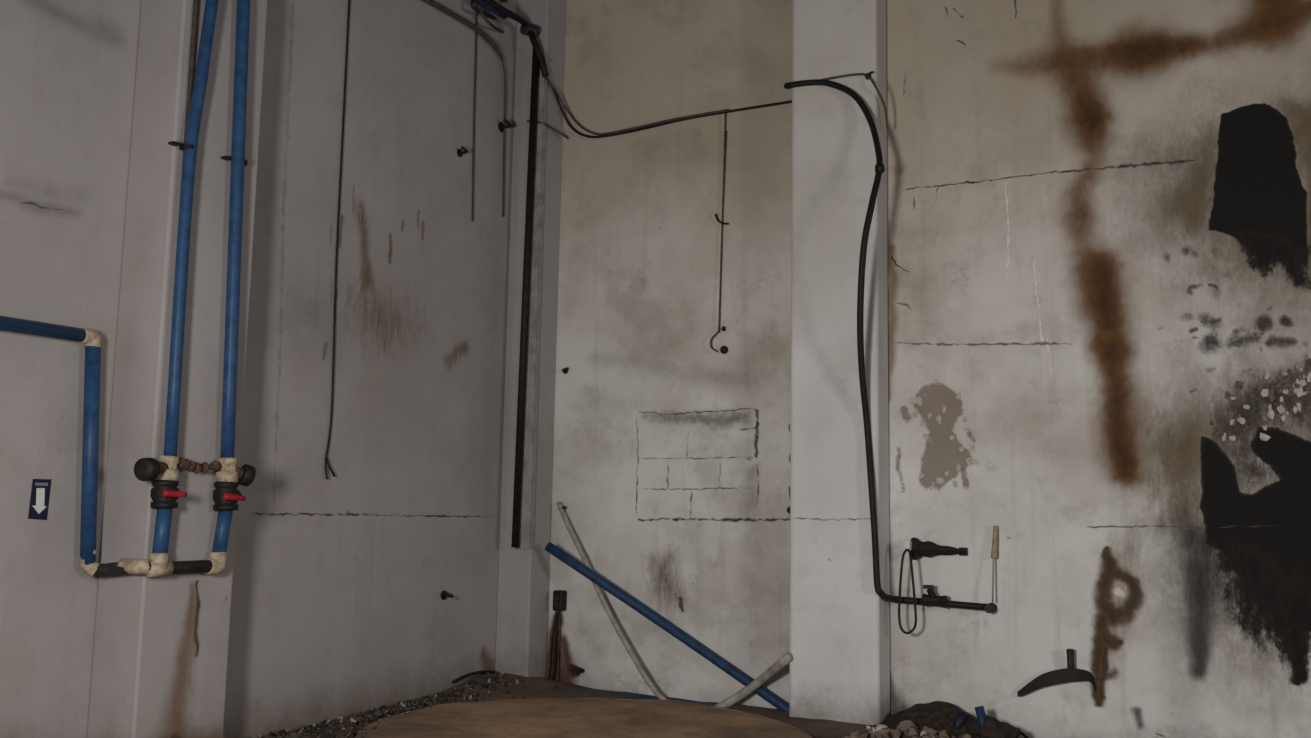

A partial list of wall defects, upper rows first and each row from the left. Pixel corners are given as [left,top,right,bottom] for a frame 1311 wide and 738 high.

rust [1037,0,1311,485]
peeling [901,379,978,489]
peeling [1210,359,1311,482]
rust [171,580,200,738]
rust [547,614,573,684]